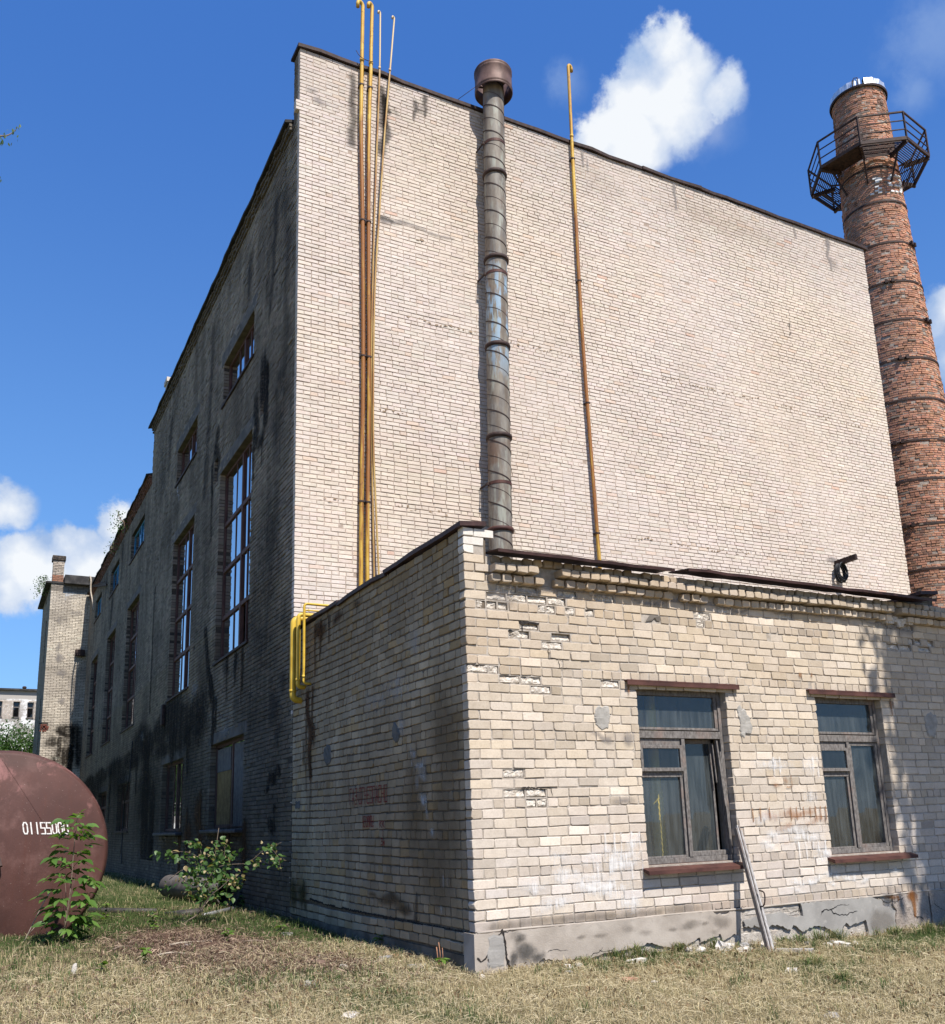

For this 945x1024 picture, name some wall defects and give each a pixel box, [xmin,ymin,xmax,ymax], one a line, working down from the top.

spalling [464,664,550,694]
spalling [503,770,546,807]
crack [790,896,942,921]